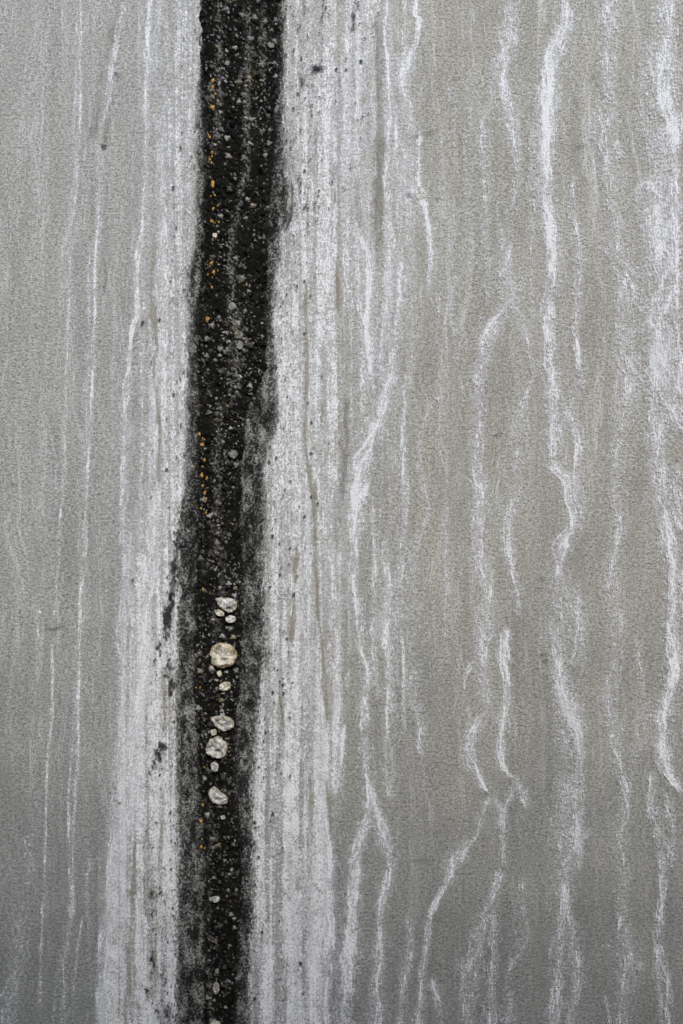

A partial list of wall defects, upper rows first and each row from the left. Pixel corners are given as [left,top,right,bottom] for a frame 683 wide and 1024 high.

water stain [23,154,79,886]
water stain [52,0,588,1024]
water stain [588,0,683,1024]